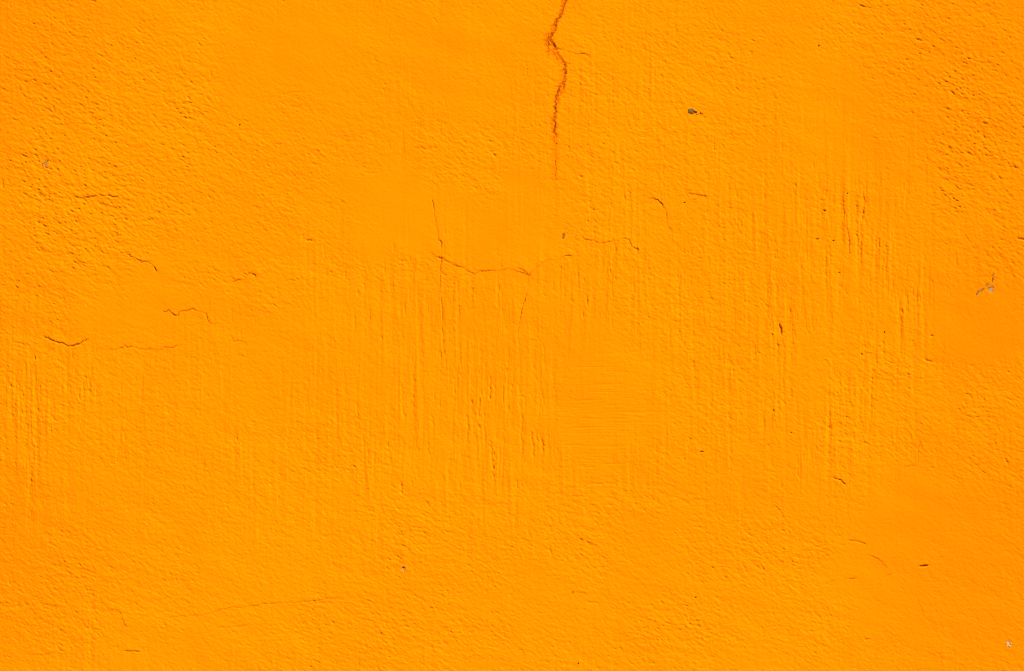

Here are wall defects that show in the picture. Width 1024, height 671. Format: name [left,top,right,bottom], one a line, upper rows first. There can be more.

crack [548,0,588,133]